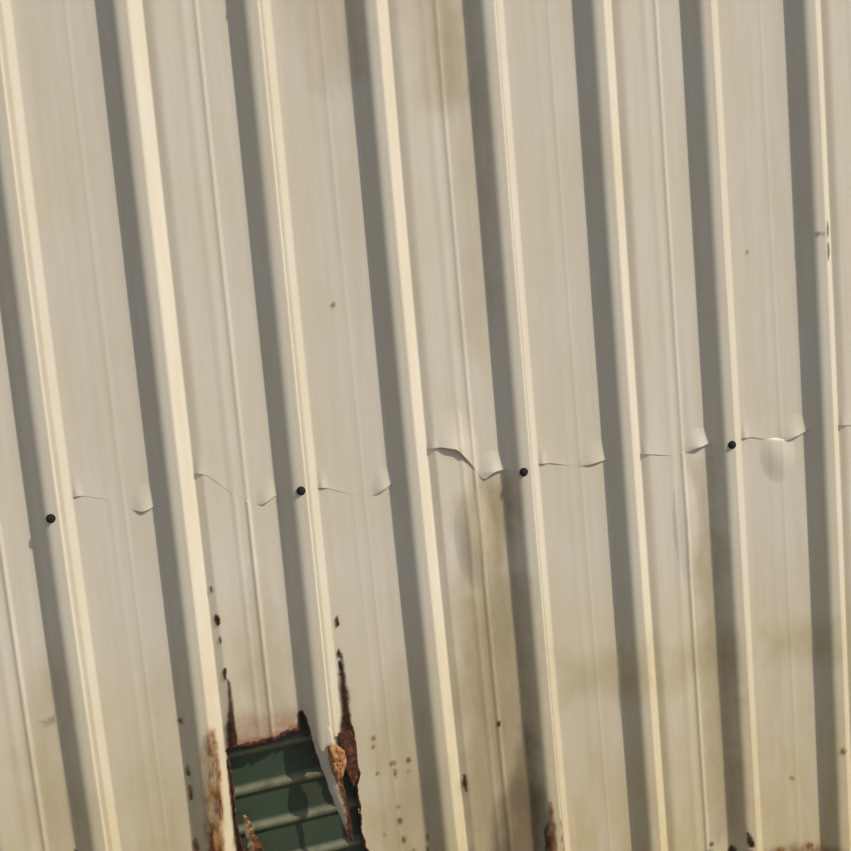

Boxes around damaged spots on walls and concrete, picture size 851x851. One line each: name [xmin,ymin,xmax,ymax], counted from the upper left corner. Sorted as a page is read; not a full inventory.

corrosion [205,668,311,851]
corrosion [328,649,369,851]
corrosion [547,803,565,851]